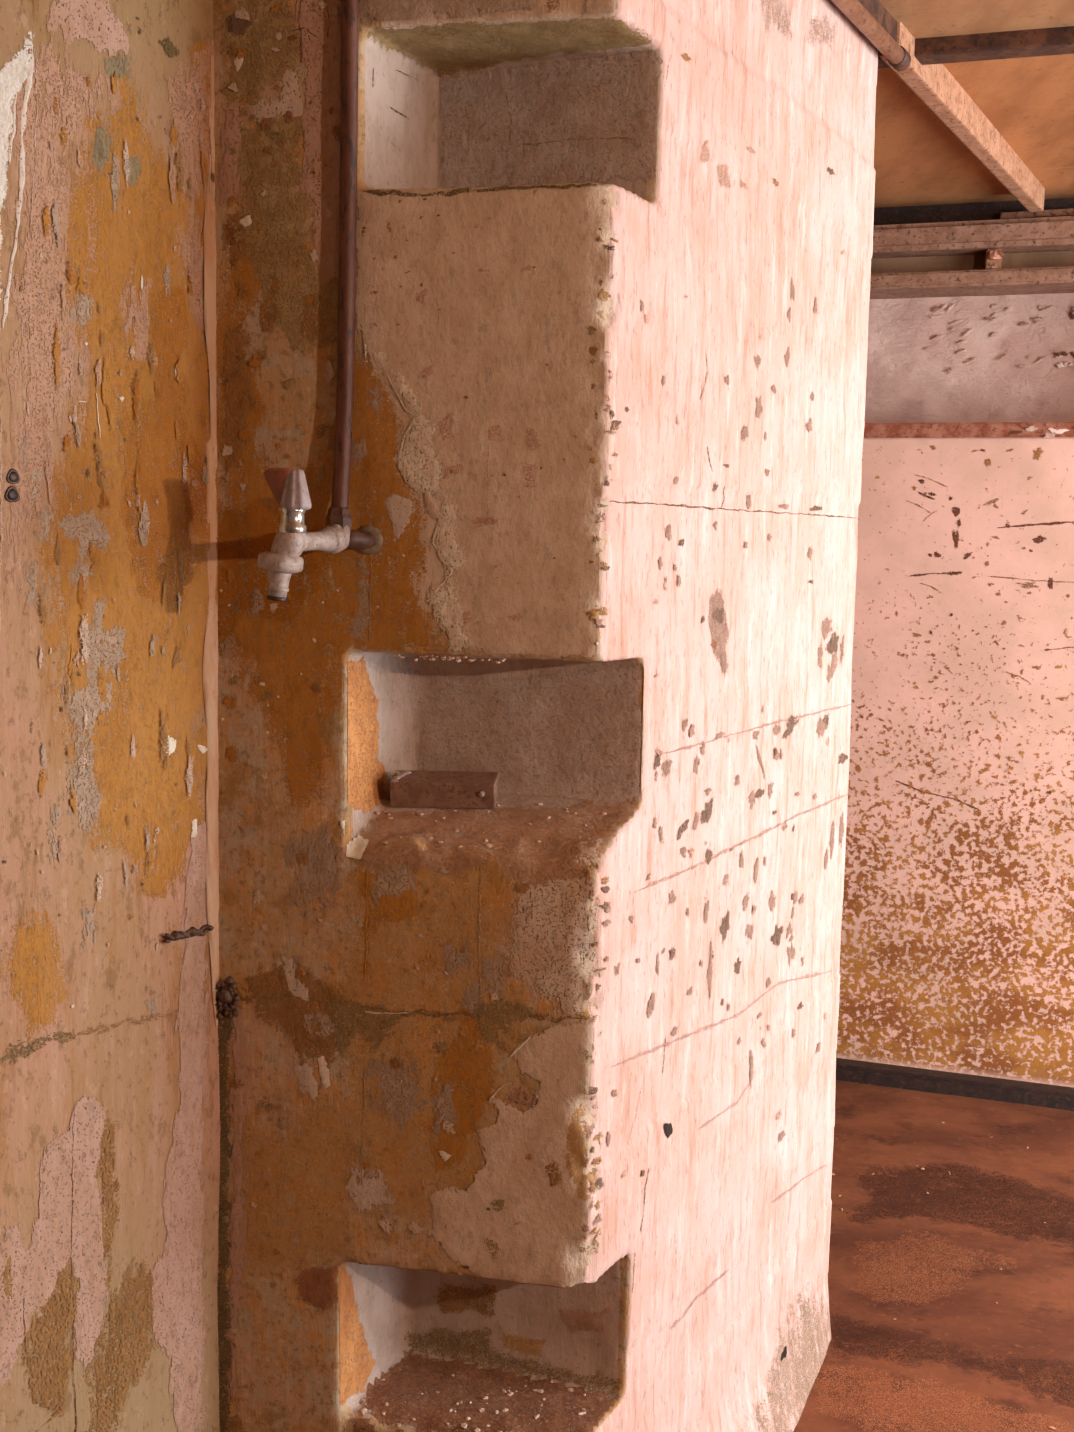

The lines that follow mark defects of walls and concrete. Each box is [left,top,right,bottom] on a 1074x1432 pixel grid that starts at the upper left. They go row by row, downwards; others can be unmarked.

peeling [159,0,341,307]
peeling [0,0,142,874]
peeling [355,50,673,812]
peeling [163,735,176,756]
peeling [701,588,729,675]
peeling [654,788,805,1014]
peeling [734,707,799,832]
peeling [817,618,845,683]
peeling [816,714,848,764]
rust [836,479,1074,1083]
peeling [149,819,264,1432]
peeling [345,836,677,1287]